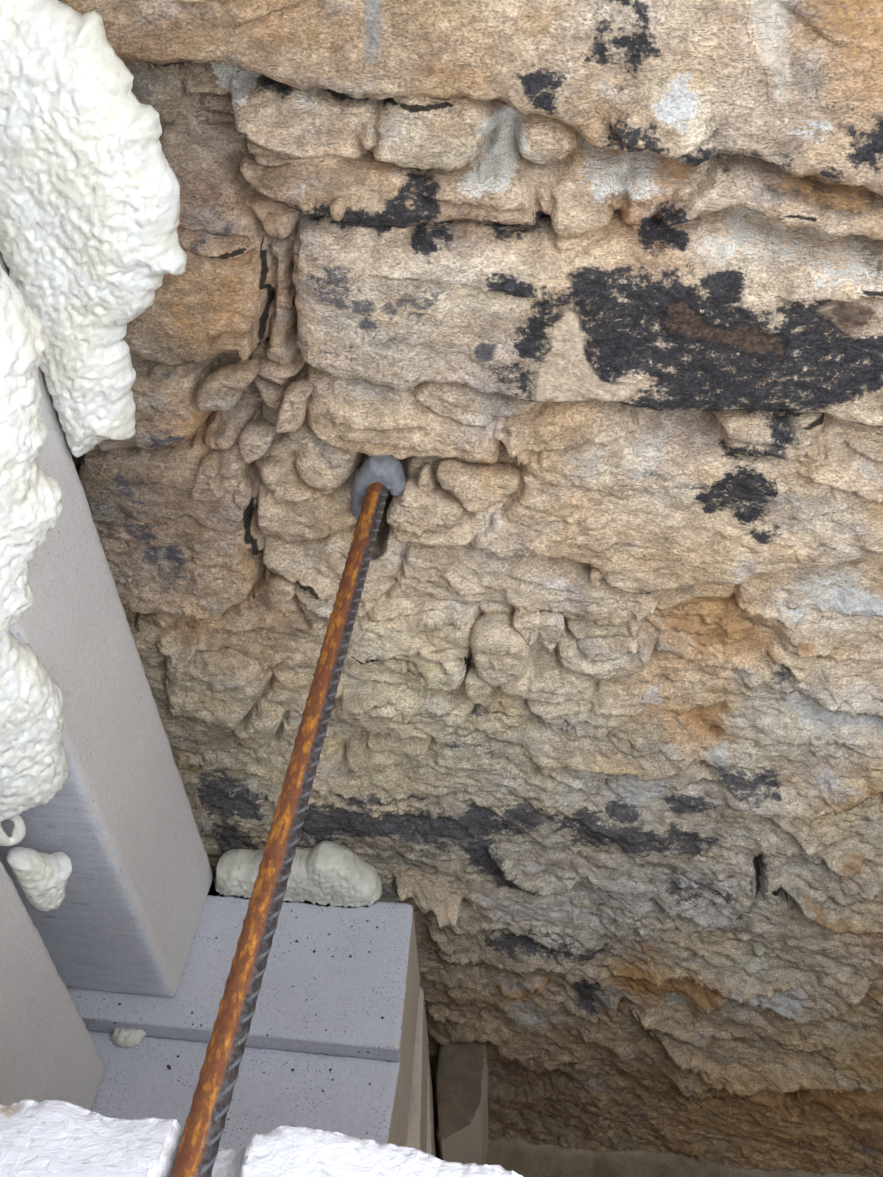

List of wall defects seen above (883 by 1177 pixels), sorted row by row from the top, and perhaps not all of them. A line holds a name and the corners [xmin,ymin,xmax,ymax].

leakage [512,0,883,189]
leakage [286,167,558,380]
leakage [470,197,883,551]
corrosion [152,518,269,646]